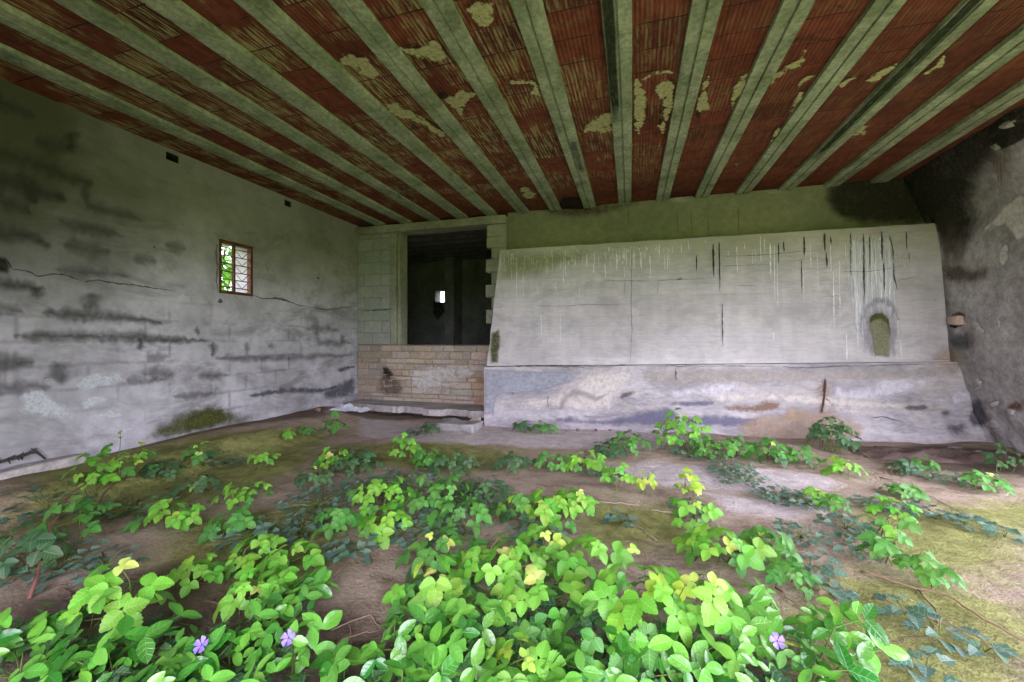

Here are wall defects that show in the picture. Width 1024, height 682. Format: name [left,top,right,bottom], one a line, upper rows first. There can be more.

peeling [467,1,494,27]
peeling [340,54,379,79]
peeling [398,40,446,63]
peeling [770,50,814,112]
peeling [633,70,675,146]
water stain [801,104,1024,362]
crack [5,258,175,291]
crack [253,295,389,311]
water stain [24,330,214,355]
water stain [250,366,355,397]
water stain [559,402,756,426]
water stain [943,400,987,433]